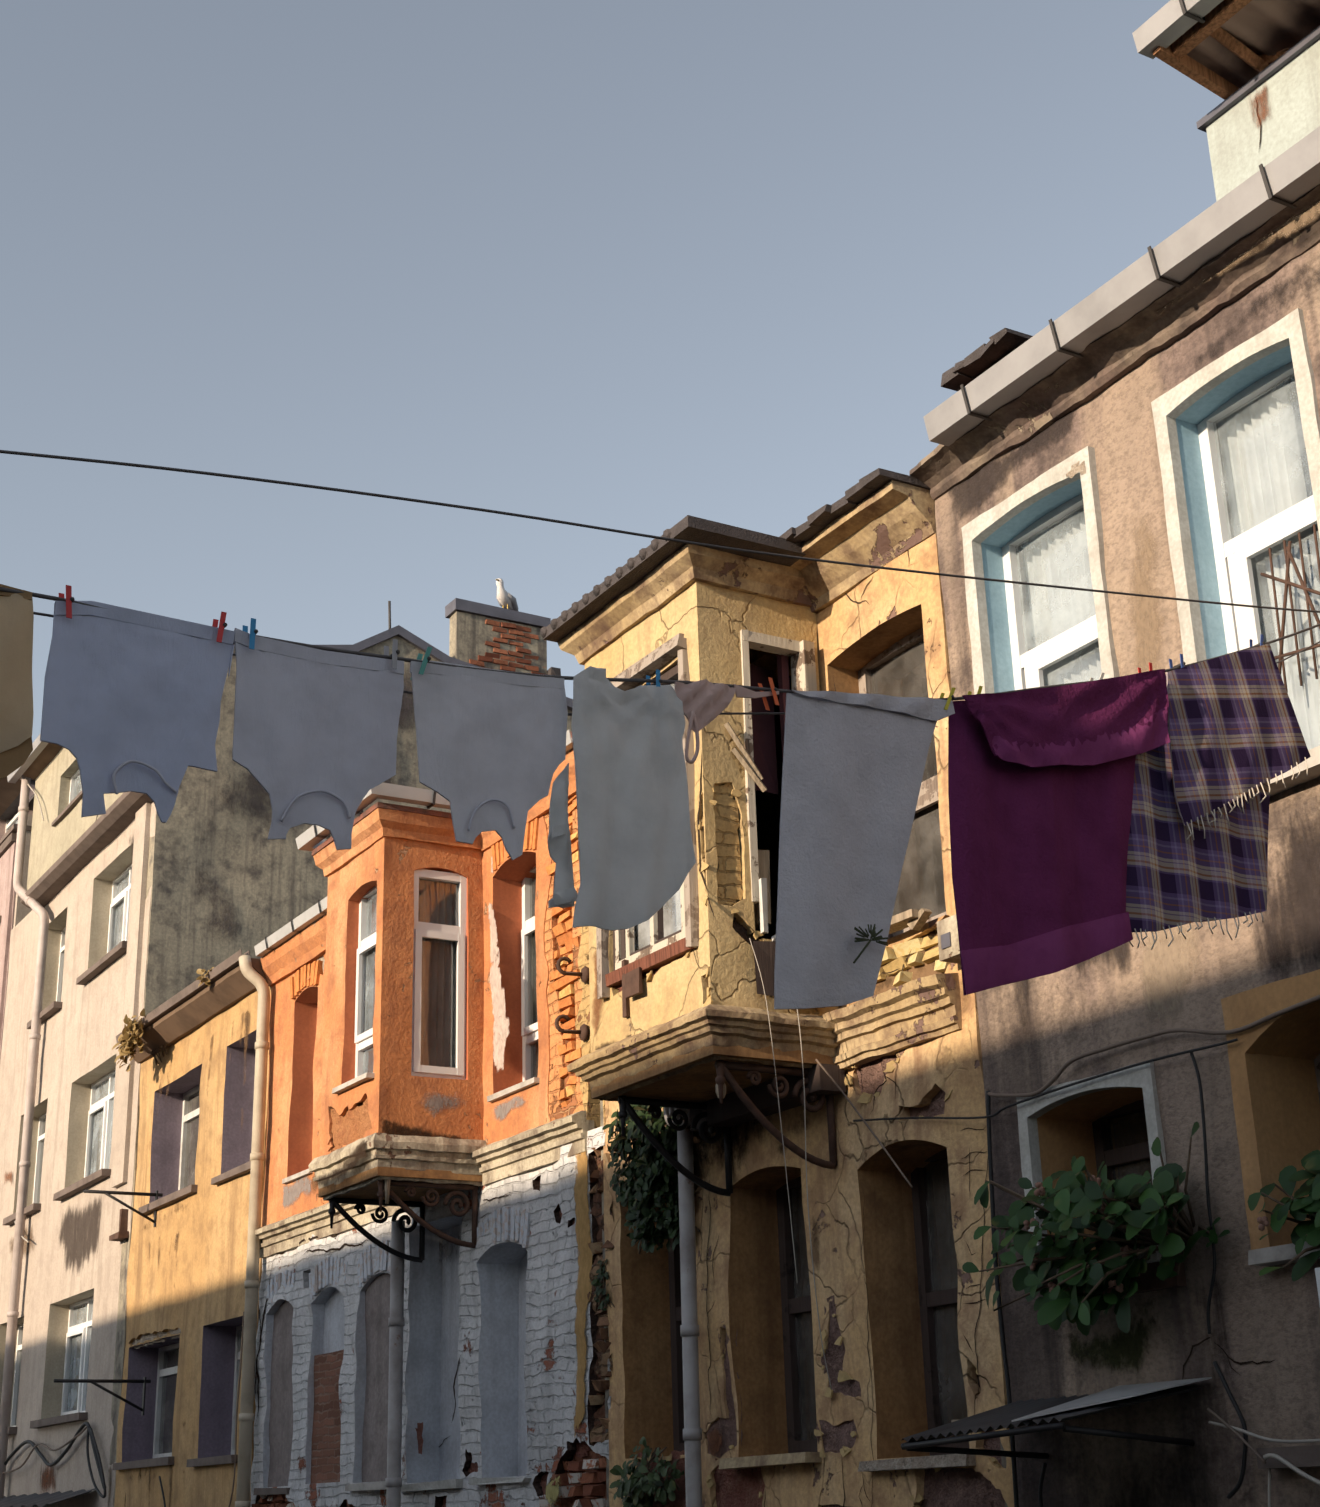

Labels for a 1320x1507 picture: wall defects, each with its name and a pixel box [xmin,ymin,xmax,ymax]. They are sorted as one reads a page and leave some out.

corrosion [1252,88,1267,124]
water stain [399,679,415,723]
water stain [223,774,272,814]
crack [697,752,715,917]
peeling [488,903,509,1070]
peeling [549,894,602,1107]
spalling [874,933,950,995]
water stain [1102,930,1195,1014]
crack [870,1067,896,1114]
crack [961,1128,988,1400]
spalling [539,1442,607,1507]
spalling [909,1430,1005,1507]